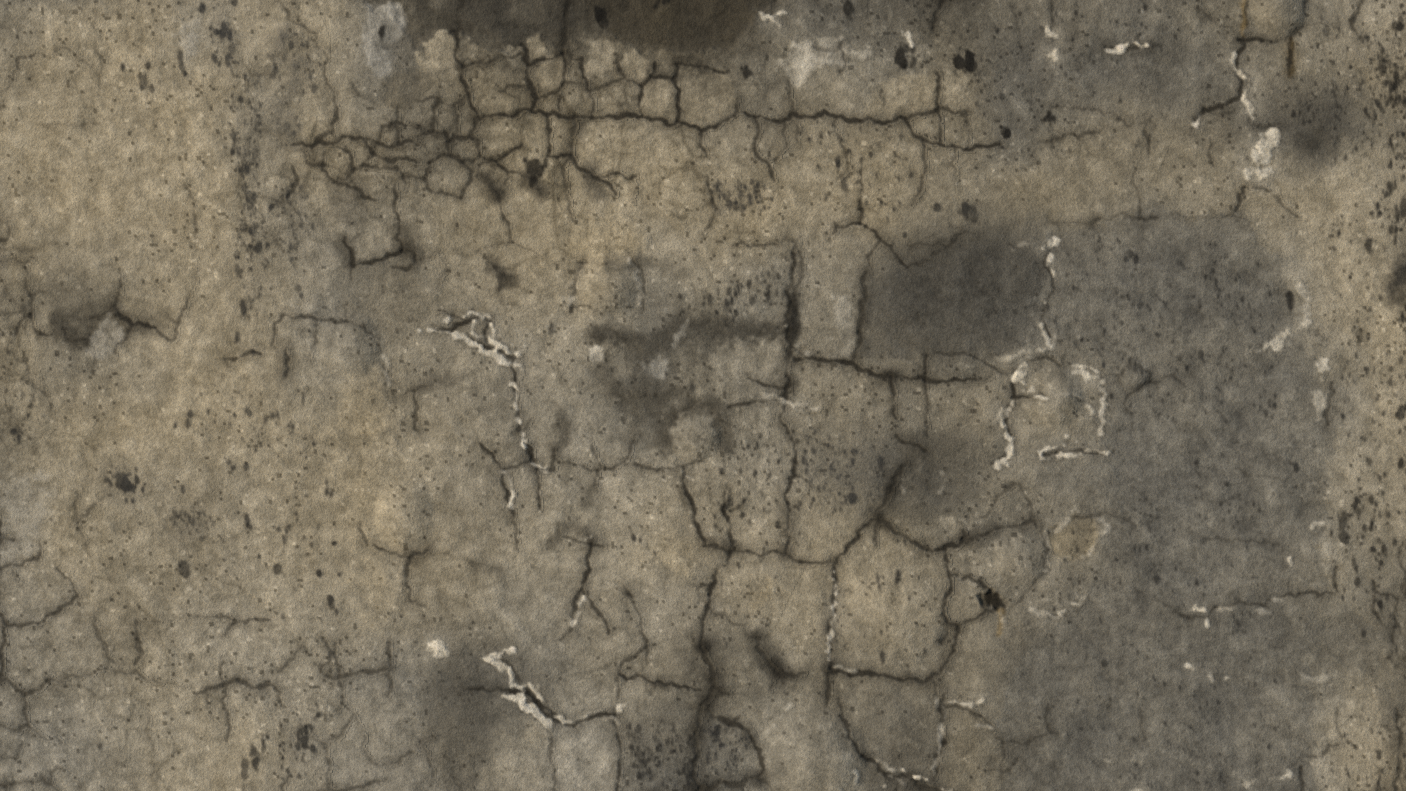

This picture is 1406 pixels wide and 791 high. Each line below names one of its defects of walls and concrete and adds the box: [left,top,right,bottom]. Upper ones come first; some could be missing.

crack [0,7,152,128]
crack [0,183,200,411]
crack [221,0,1301,791]
water stain [356,0,1406,791]
crack [0,489,466,791]